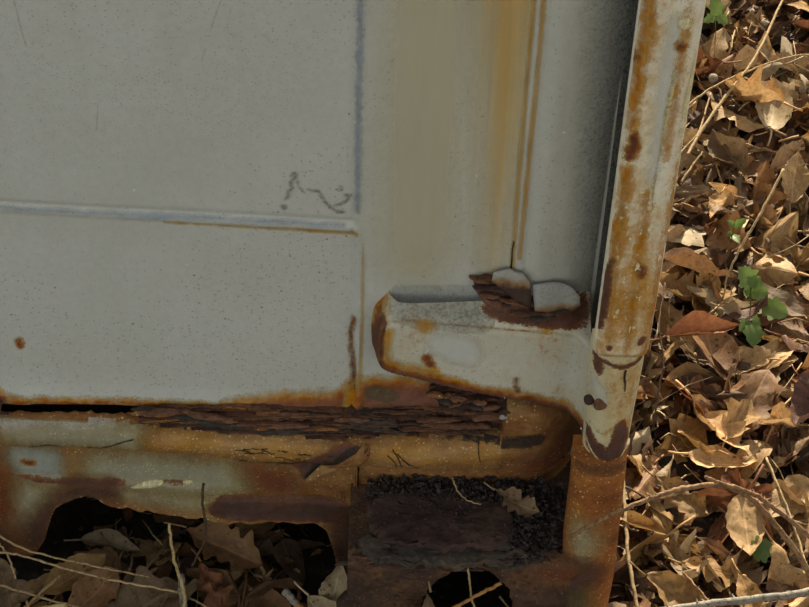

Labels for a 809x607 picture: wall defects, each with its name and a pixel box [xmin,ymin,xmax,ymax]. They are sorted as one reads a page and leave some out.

corrosion [480,0,663,376]
corrosion [660,9,693,242]
corrosion [0,258,584,468]
corrosion [0,458,193,552]
corrosion [207,494,350,575]